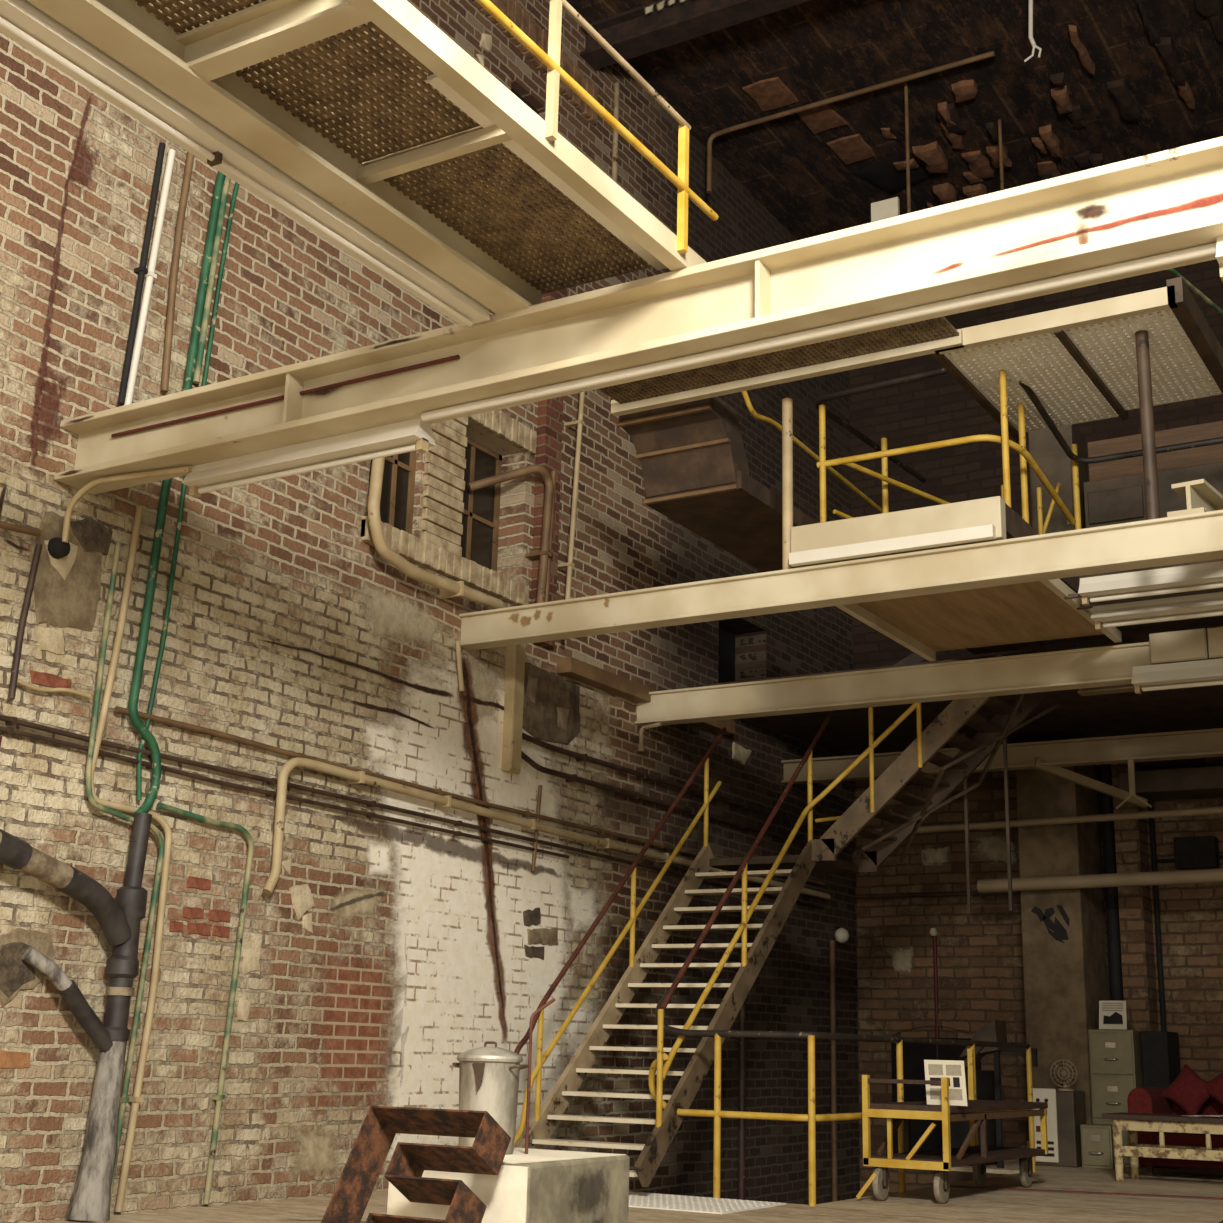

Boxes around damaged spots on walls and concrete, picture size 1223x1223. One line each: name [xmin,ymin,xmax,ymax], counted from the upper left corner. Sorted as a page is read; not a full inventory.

peeling [742,77,875,165]
rust [996,193,1223,255]
spalling [30,511,113,655]
peeling [314,662,596,1148]
spalling [0,928,56,1007]
peeling [387,1133,459,1164]